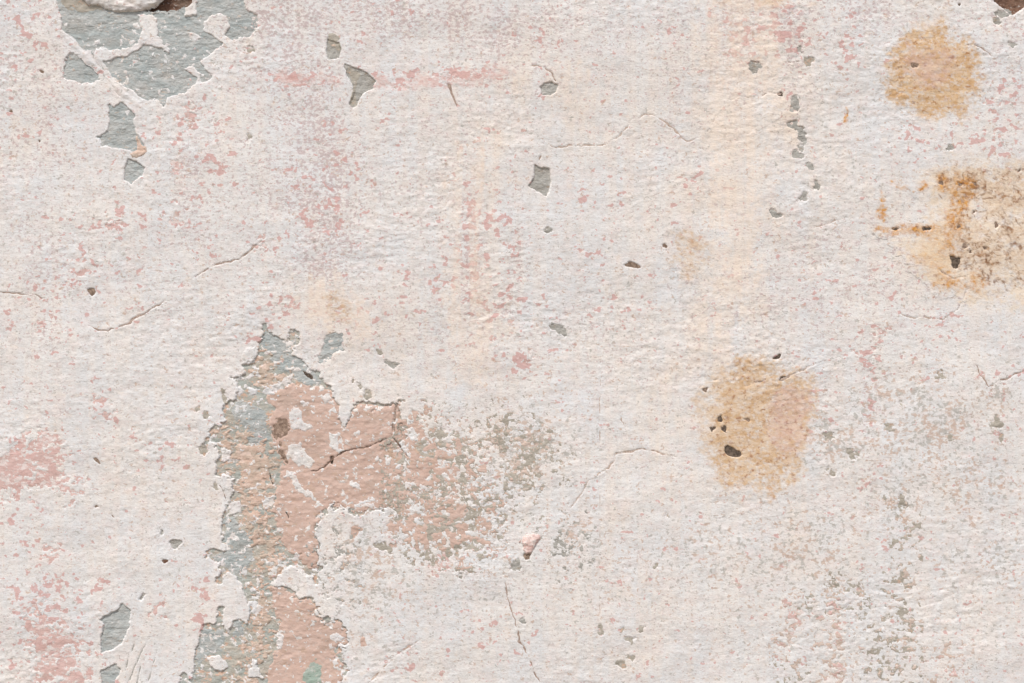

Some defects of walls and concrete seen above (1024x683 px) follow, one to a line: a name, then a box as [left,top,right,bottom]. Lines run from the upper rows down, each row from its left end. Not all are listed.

peeling [57,0,258,129]
peeling [326,33,376,108]
peeling [97,102,147,184]
peeling [529,156,551,196]
crack [195,241,261,277]
corrosion [871,141,1024,322]
crack [91,302,163,332]
crack [312,403,407,471]
crack [572,373,676,506]
peeling [179,322,606,683]
peeling [15,593,131,683]